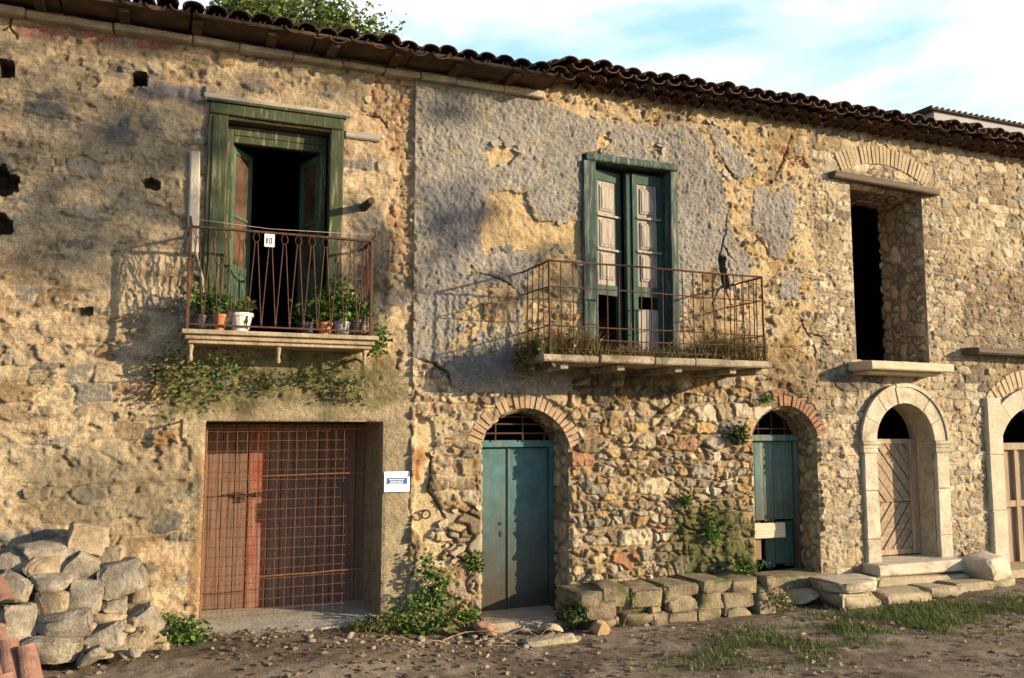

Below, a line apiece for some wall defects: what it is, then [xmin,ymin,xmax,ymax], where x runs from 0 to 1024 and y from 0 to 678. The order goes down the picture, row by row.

flaking render [486,140,524,167]
flaking render [481,189,583,266]
flaking render [545,93,794,350]
crack [718,217,733,259]